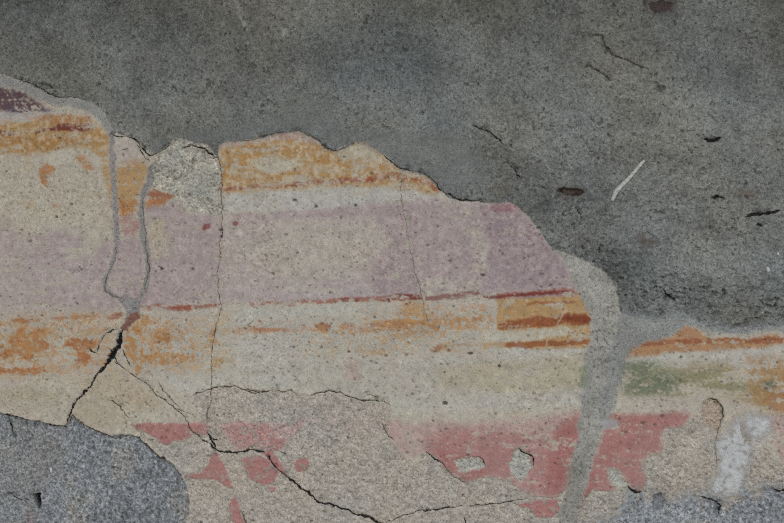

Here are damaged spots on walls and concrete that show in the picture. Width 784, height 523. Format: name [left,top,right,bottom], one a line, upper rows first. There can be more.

crack [593,34,661,89]
spalling [152,139,225,216]
crack [744,210,780,226]
spalling [576,234,784,334]
crack [49,130,521,523]
peeling [577,406,725,523]
peeling [740,447,784,500]